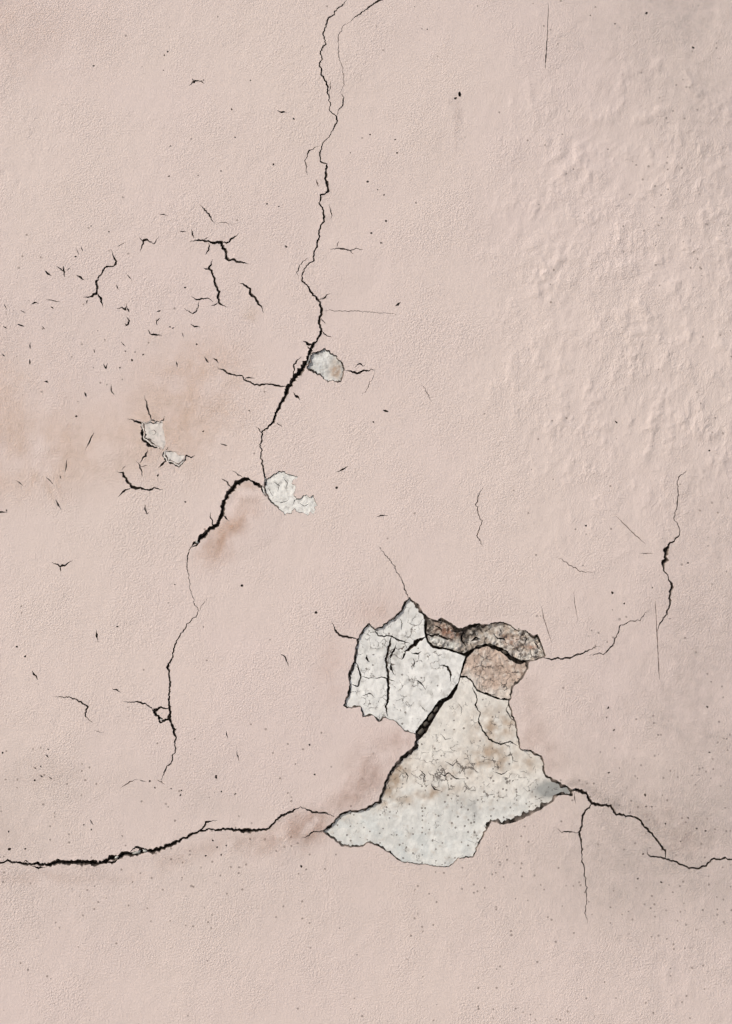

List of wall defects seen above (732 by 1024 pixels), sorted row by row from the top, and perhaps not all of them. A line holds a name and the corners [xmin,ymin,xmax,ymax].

crack [2,206,264,397]
crack [113,0,401,788]
spalling [306,348,345,383]
spalling [141,420,185,467]
spalling [261,471,317,516]
crack [59,696,102,733]
spalling [322,597,575,867]
crack [0,806,334,869]
crack [556,788,732,922]